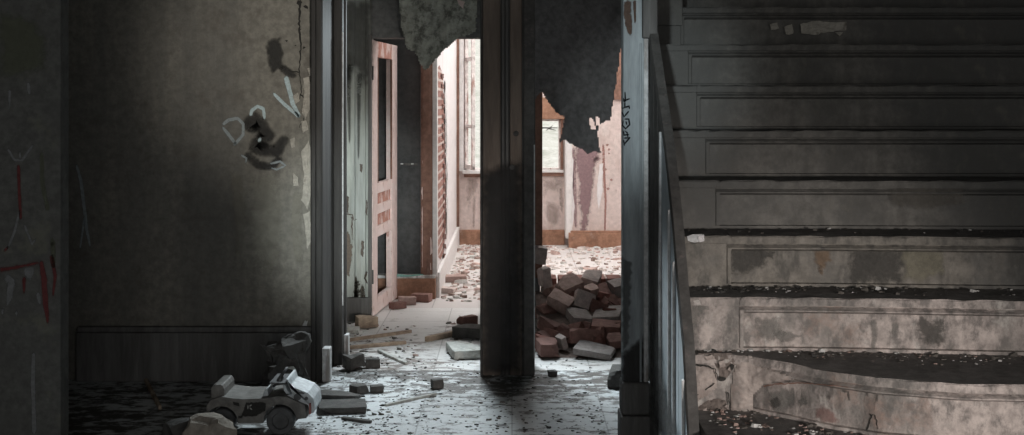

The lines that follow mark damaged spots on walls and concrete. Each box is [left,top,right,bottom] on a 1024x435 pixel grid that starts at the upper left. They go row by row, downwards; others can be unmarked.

peeling [770,21,847,36]
flaking render [290,68,311,249]
damp [572,147,600,231]
damp [759,319,798,341]